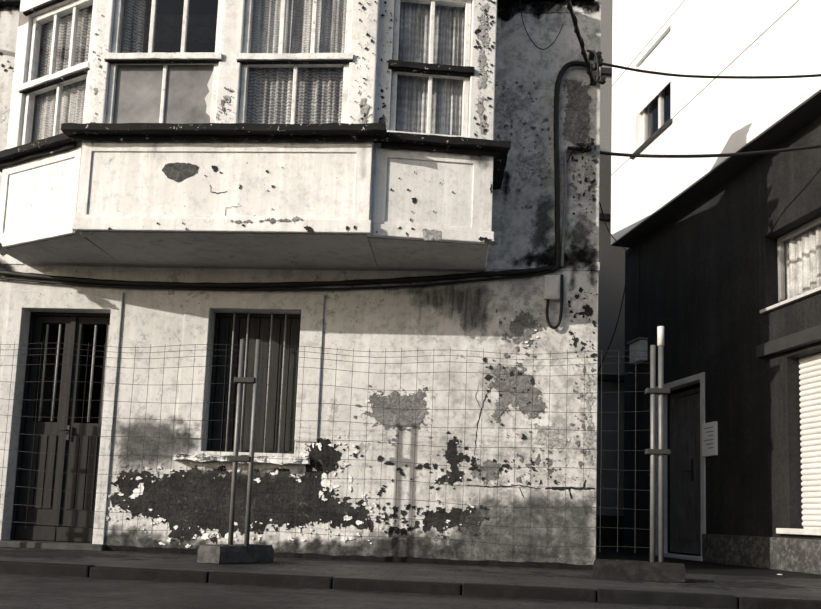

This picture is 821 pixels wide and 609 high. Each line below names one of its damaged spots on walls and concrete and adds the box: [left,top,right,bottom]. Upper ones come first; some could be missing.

damp [497,1,600,27]
peeling [473,0,552,192]
spalling [162,162,222,182]
peeling [562,79,598,215]
damp [514,200,599,287]
damp [114,416,198,474]
peeling [106,287,598,548]